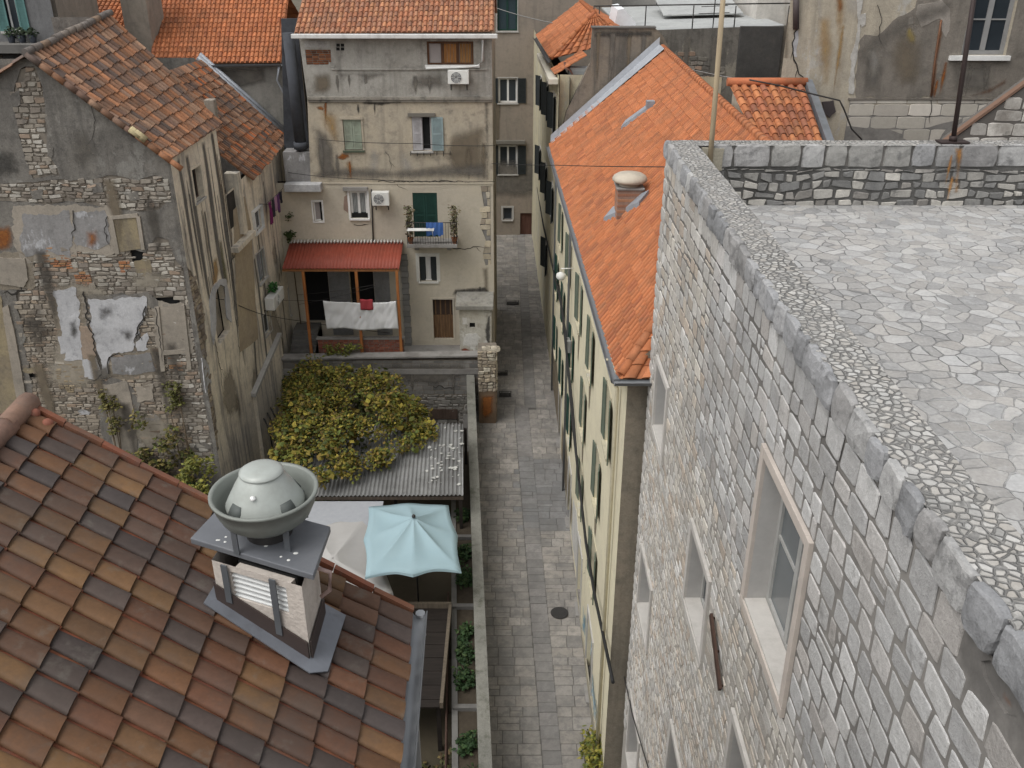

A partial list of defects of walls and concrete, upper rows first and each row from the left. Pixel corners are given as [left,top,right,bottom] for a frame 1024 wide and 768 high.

crack [791,29,803,77]
spalling [0,66,232,476]